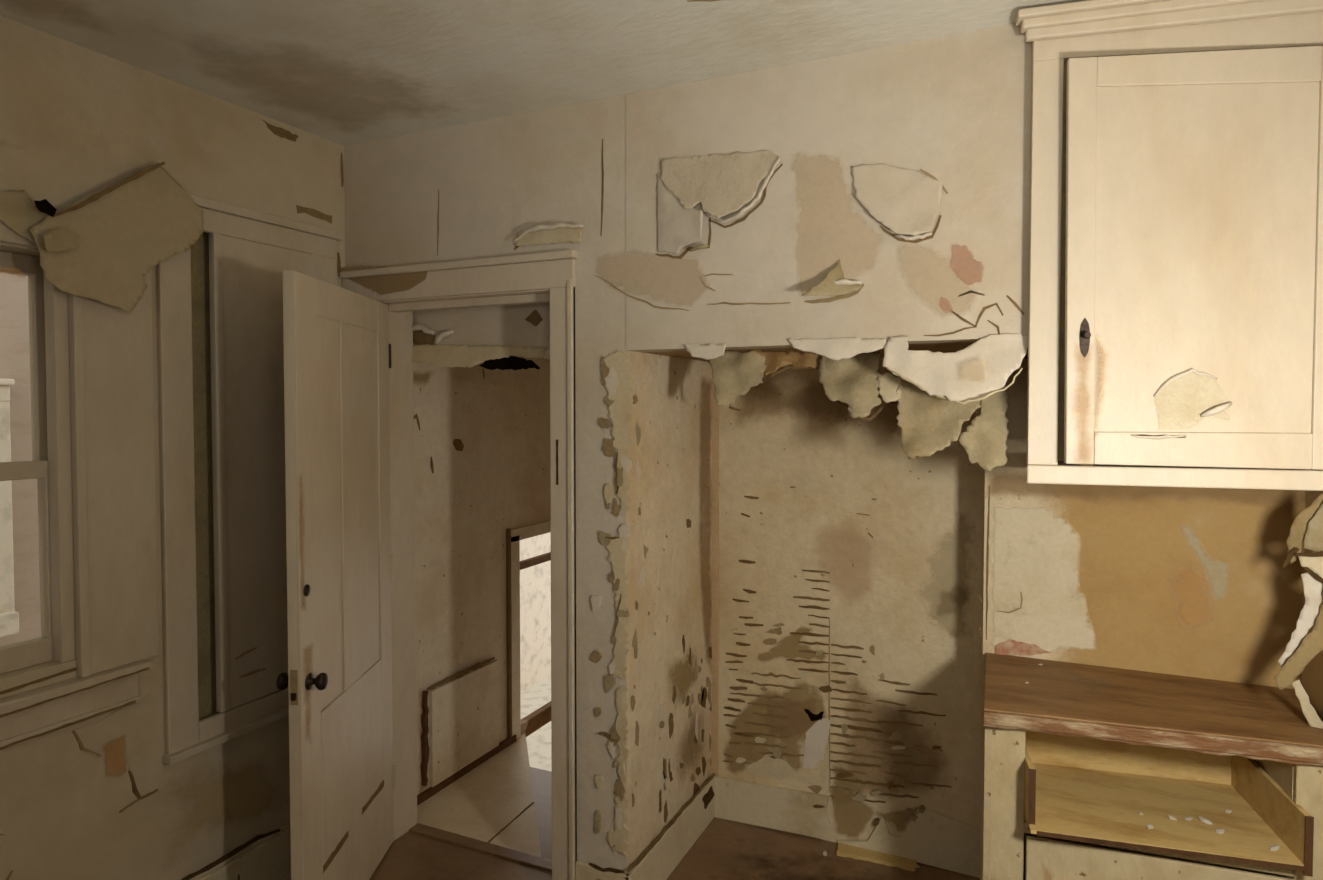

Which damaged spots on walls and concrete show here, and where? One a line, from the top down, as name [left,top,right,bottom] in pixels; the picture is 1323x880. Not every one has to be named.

peeling [851,163,948,243]
flaking render [950,245,983,285]
spalling [590,350,649,856]
flaking render [922,517,968,636]
flaking render [992,508,1095,665]
peeling [659,635,715,823]
leakage [832,768,918,837]